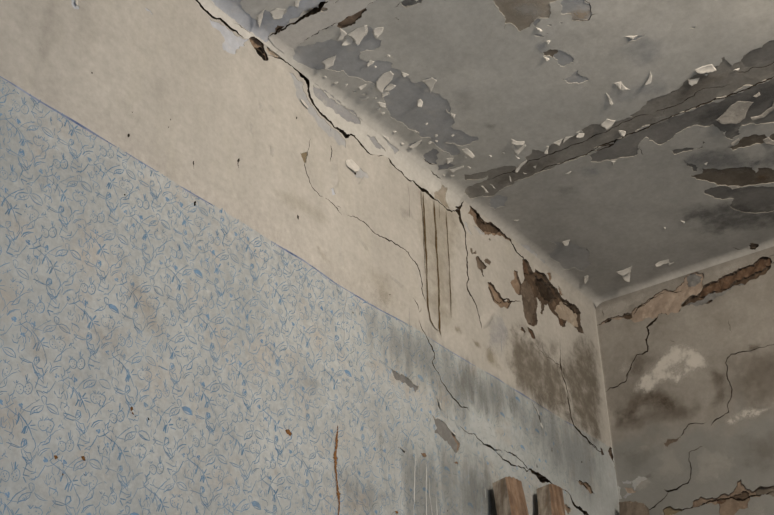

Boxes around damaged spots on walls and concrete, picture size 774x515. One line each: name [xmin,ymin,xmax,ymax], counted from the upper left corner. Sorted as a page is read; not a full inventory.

crack [196,0,242,36]
crack [268,1,482,328]
peeling [209,0,774,339]
crack [492,62,774,179]
crack [304,144,589,515]
damp [514,344,599,435]
crack [536,345,614,462]
crack [606,314,659,392]
damp [631,345,707,413]
crack [649,344,774,510]
spalling [663,480,774,515]